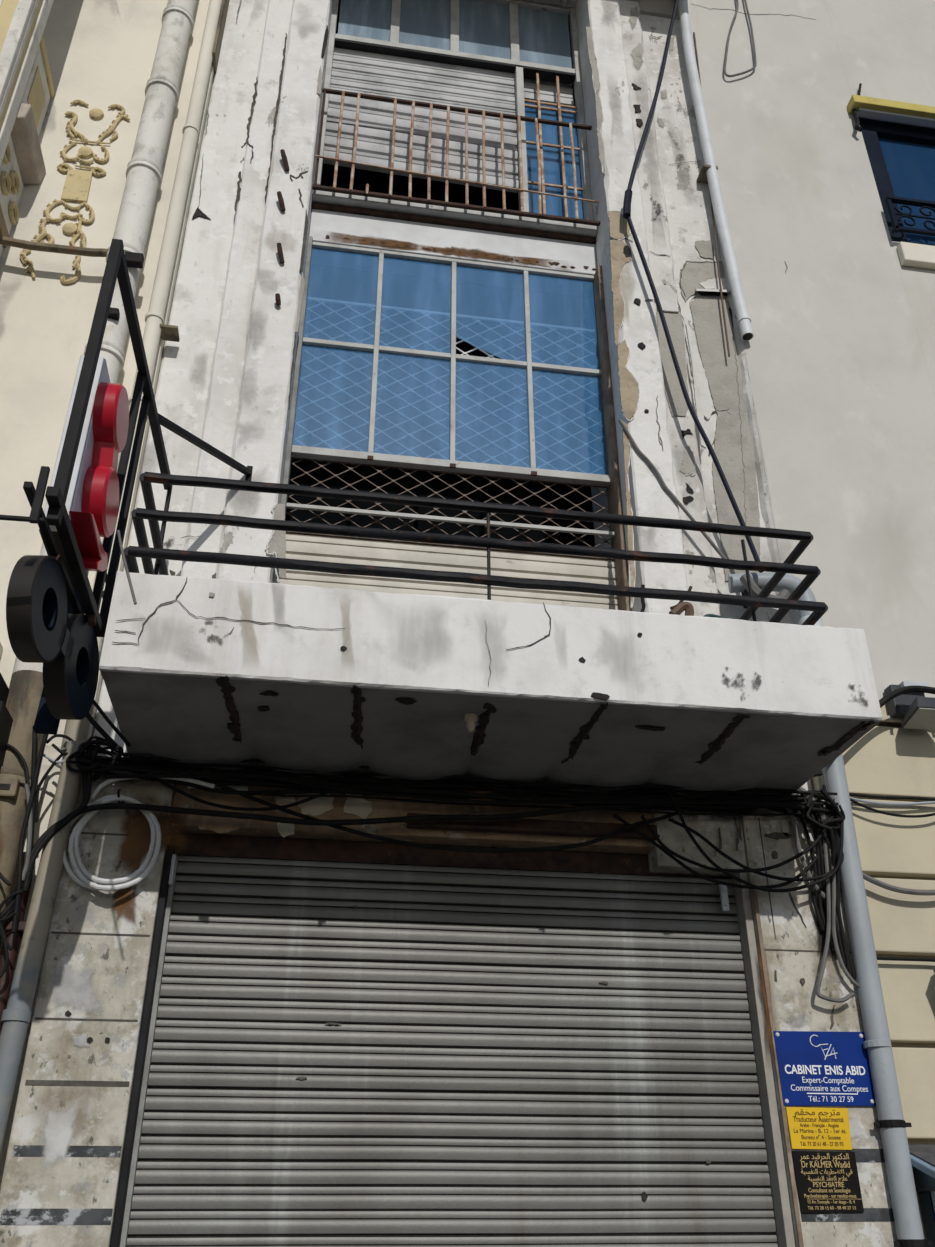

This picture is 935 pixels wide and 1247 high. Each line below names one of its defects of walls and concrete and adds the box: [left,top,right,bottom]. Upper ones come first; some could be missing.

peeling [631,43,644,69]
crack [192,33,308,220]
flaking render [586,26,606,174]
peeling [632,83,664,128]
corrosion [334,233,549,267]
flaking render [608,211,761,609]
crack [112,578,345,644]
crack [485,602,551,686]